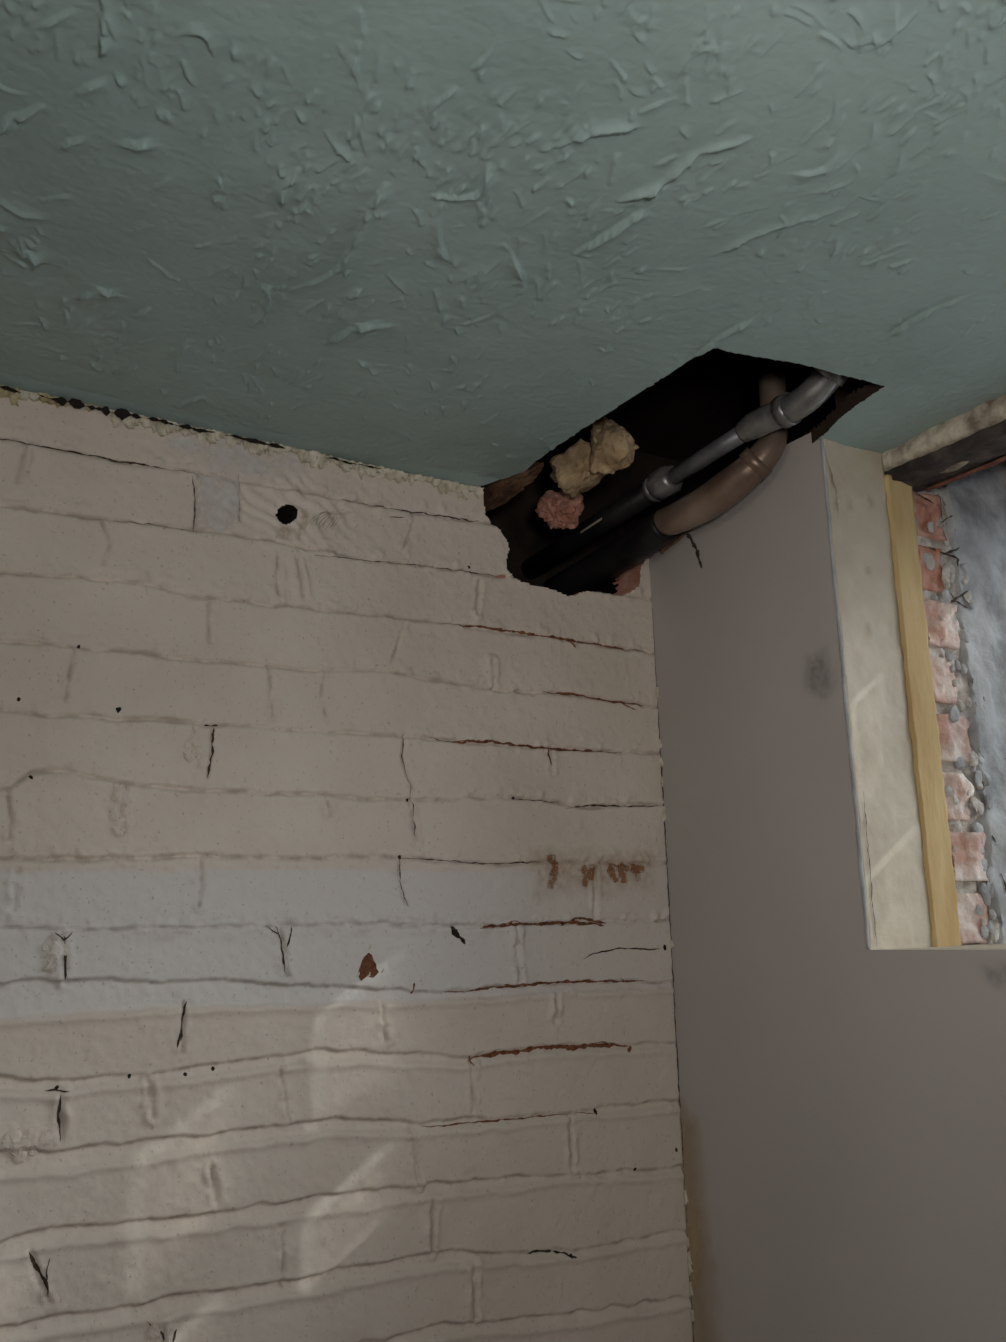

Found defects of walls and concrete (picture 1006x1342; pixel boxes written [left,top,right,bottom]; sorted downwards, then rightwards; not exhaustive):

spalling [613,560,645,596]
rust [548,855,558,888]
rust [582,863,644,887]
peeling [357,944,384,981]